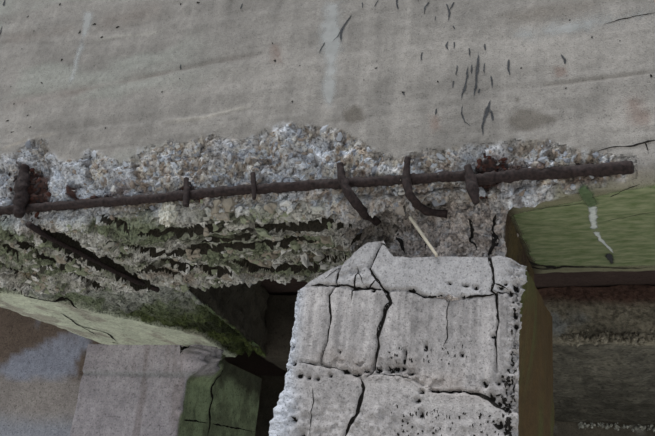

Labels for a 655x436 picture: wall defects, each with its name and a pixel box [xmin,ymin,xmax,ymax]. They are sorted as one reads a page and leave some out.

water stain [319,5,351,103]
corrosion [27,168,52,204]
corrosion [66,185,113,201]
corrosion [475,153,519,174]
crack [599,140,655,151]
spalling [0,122,638,436]
crack [466,215,517,363]
crack [2,208,429,436]
crack [413,291,450,344]
crack [429,389,509,413]